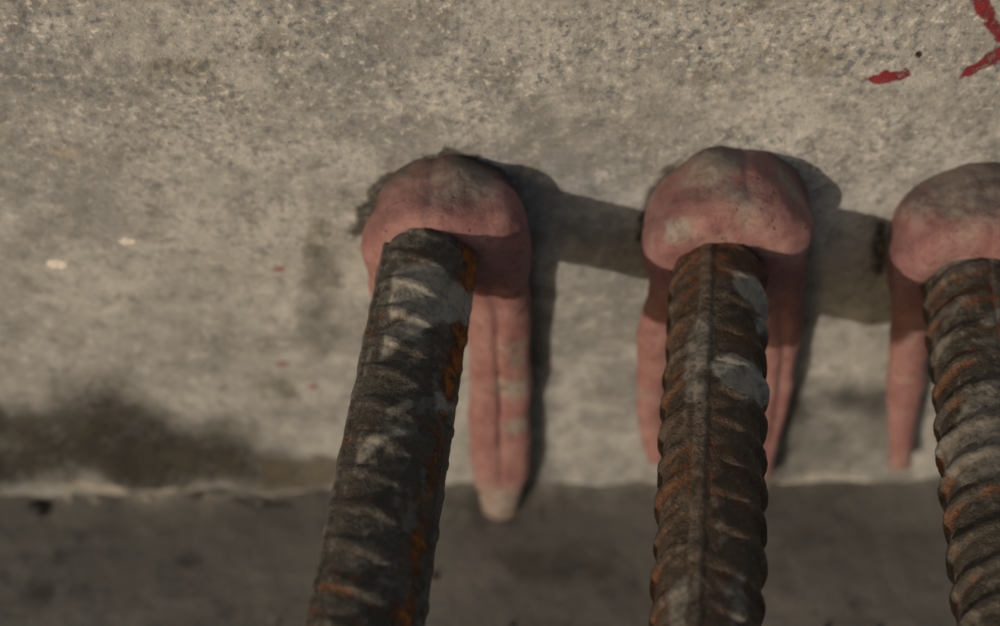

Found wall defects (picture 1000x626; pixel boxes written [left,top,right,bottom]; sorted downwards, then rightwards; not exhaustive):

damp [0,392,337,497]